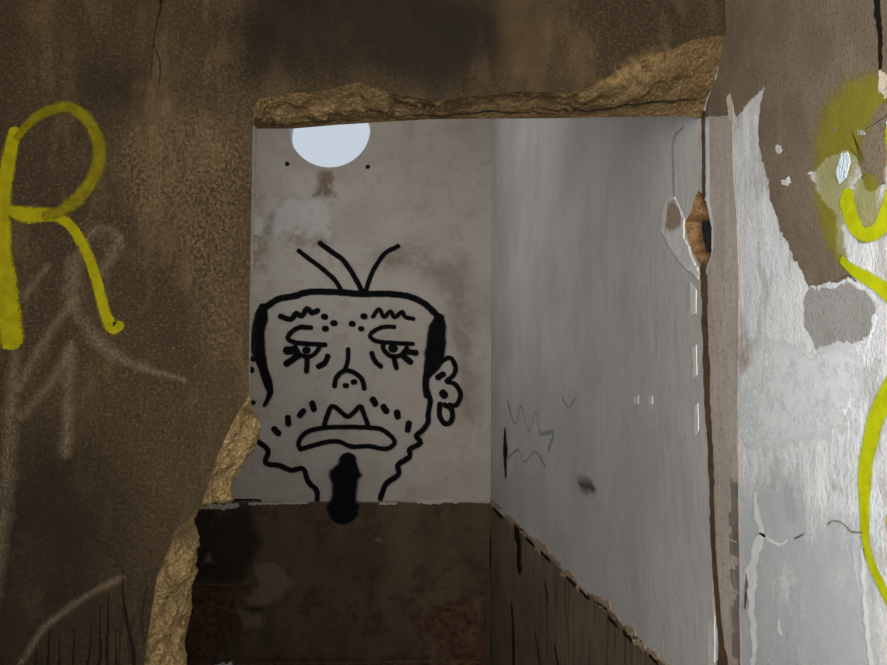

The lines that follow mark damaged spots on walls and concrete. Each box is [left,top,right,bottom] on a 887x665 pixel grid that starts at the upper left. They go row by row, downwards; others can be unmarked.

crack [150,6,162,85]
crack [874,0,883,70]
peeling [253,0,887,350]
flaking render [144,395,308,665]
spalling [416,496,458,505]
peeling [708,615,716,665]